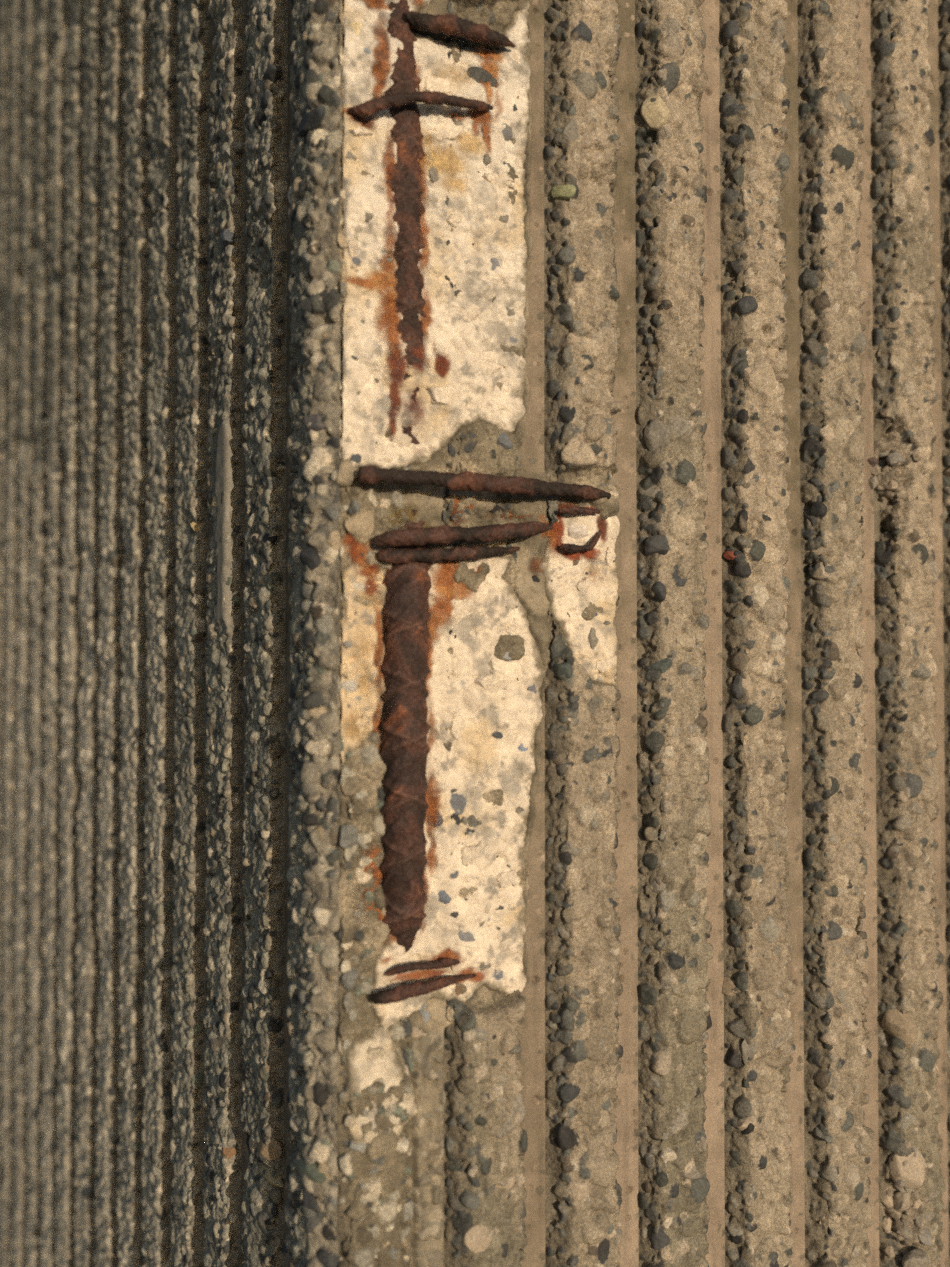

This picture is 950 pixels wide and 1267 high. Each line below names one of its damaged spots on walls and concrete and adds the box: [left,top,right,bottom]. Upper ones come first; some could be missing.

corrosion [373,25,390,98]
flaking render [299,106,325,137]
corrosion [452,46,502,151]
flaking render [551,185,576,200]
spalling [342,0,534,470]
corrosion [348,223,450,435]
flaking render [303,414,326,432]
spalling [605,471,621,499]
corrosion [541,504,607,560]
corrosion [426,560,472,690]
spalling [340,502,623,1153]
corrosion [396,949,484,983]